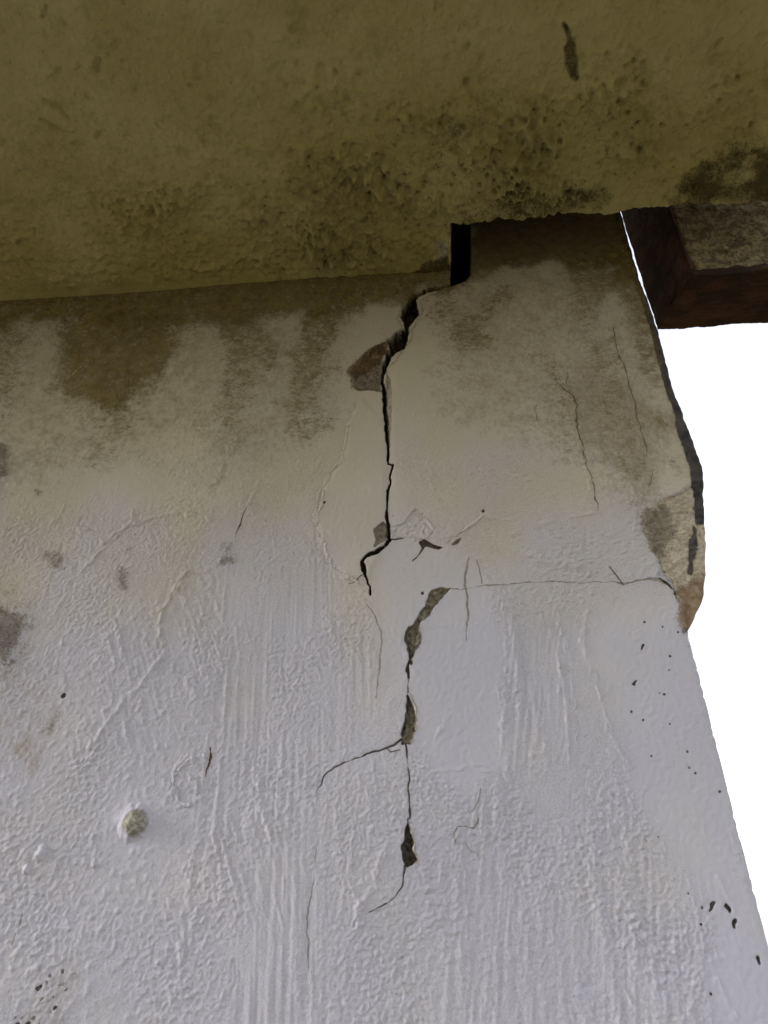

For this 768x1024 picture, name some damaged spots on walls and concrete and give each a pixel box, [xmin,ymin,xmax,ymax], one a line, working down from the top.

damp [679,147,768,205]
damp [0,256,455,437]
flaking render [347,341,389,392]
crack [553,372,598,504]
spalling [618,212,706,633]
crack [317,223,562,912]
crack [592,566,677,598]